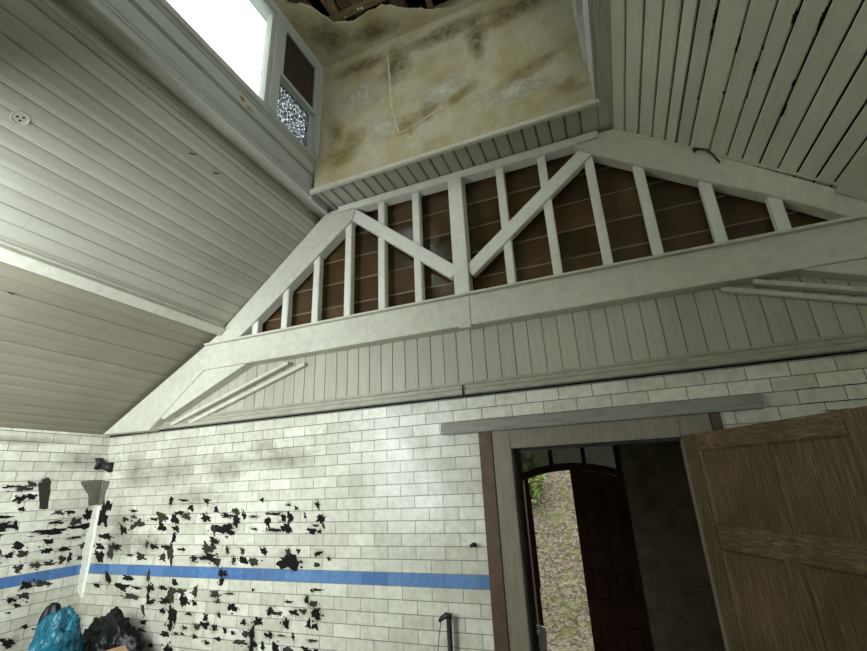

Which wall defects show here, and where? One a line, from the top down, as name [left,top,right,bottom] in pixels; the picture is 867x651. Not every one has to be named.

spalling [0,477,326,651]